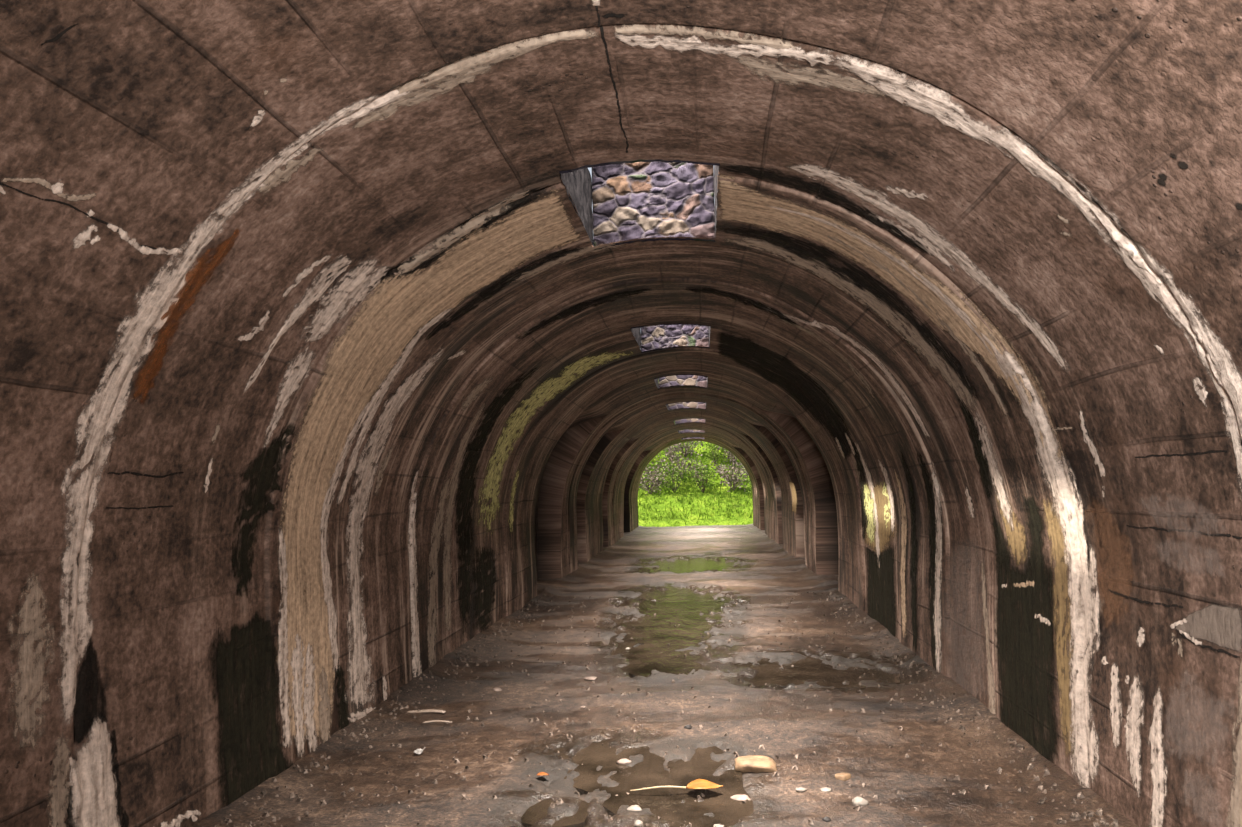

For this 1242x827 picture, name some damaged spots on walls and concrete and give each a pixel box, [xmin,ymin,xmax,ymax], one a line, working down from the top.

spalling [251,110,265,127]
crack [595,6,629,153]
crack [0,178,182,255]
leakage [518,289,648,339]
leakage [615,24,1242,492]
leakage [9,30,624,827]
leakage [686,164,1167,827]
leakage [1226,662,1242,827]